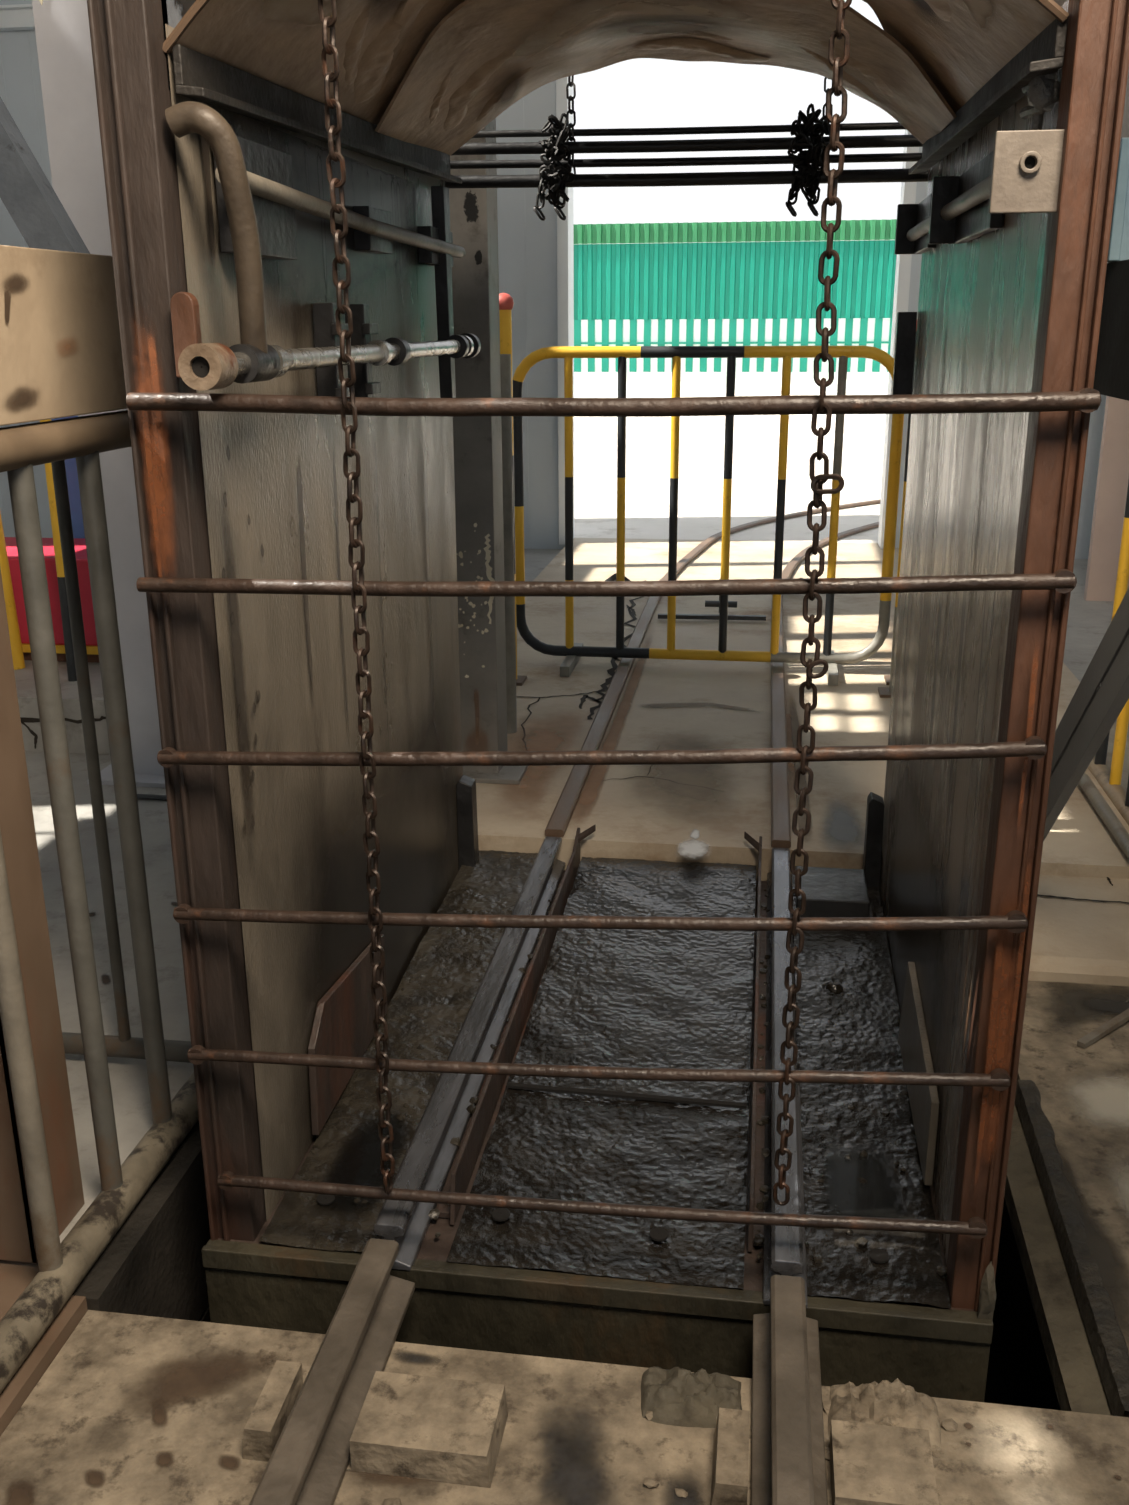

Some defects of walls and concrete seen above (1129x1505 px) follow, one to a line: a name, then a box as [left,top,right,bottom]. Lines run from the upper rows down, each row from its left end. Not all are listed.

rust [139,338,161,393]
rust [141,411,172,578]
crack [516,580,647,750]
spalling [641,1367,742,1428]
spalling [822,1378,958,1468]
spalling [643,1478,688,1498]